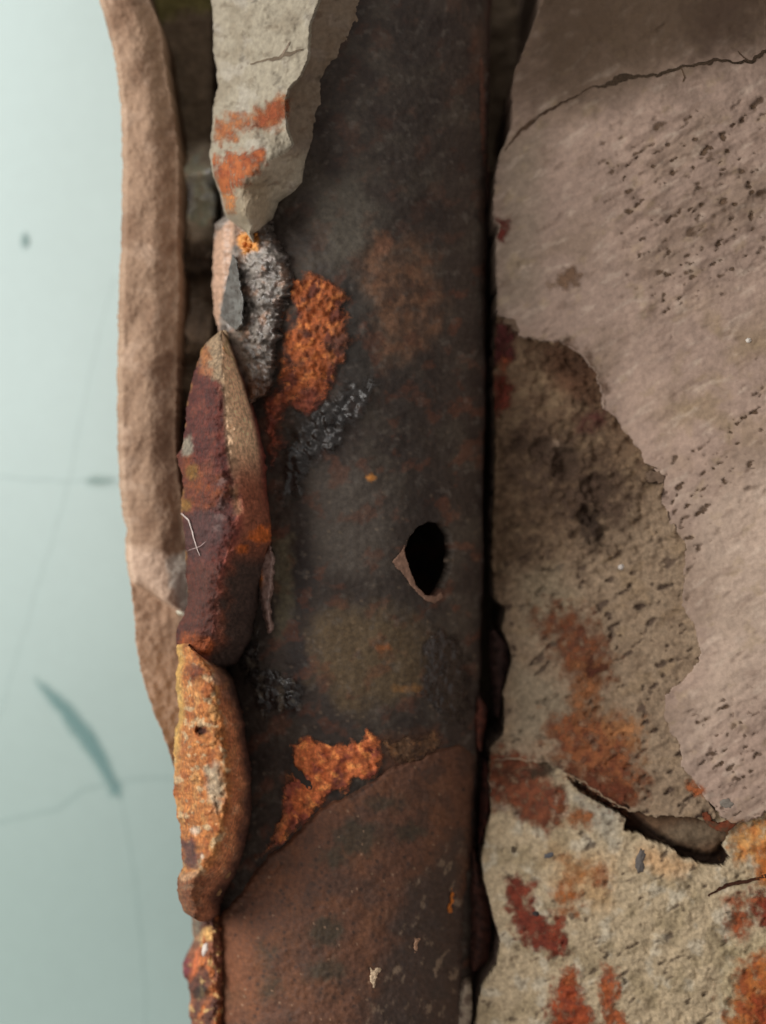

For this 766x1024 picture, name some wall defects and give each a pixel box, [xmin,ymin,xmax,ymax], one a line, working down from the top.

corrosion [212,97,289,211]
crack [504,50,766,151]
corrosion [173,271,651,1024]
spalling [458,316,766,1024]
crack [568,772,630,809]
corrosion [724,821,766,938]
corrosion [722,952,766,1024]